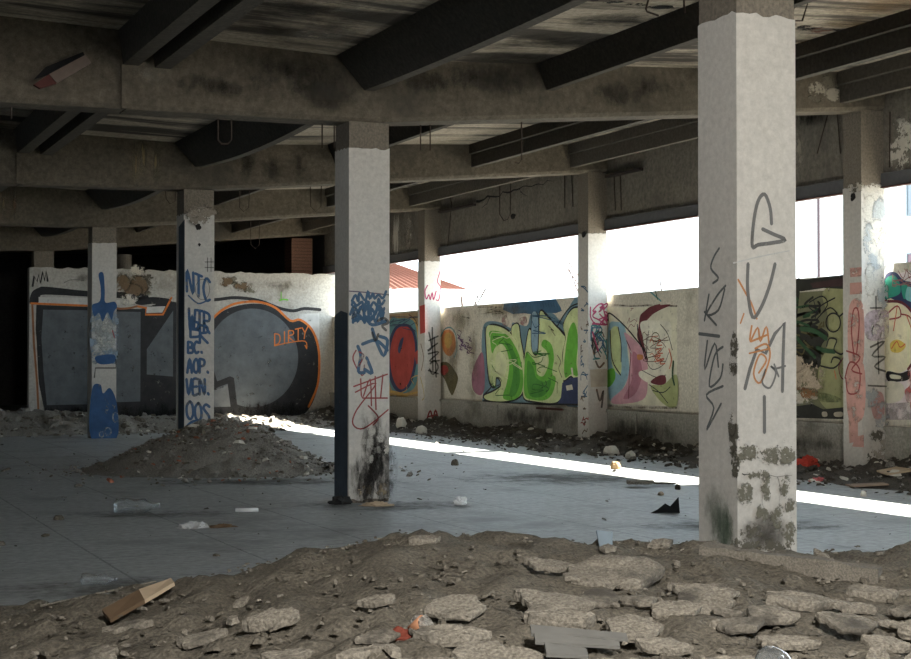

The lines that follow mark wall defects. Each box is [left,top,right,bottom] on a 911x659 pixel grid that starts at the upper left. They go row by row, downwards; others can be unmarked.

spalling [808,75,840,103]
peeling [889,112,911,170]
peeling [186,205,218,230]
leakage [356,423,392,503]